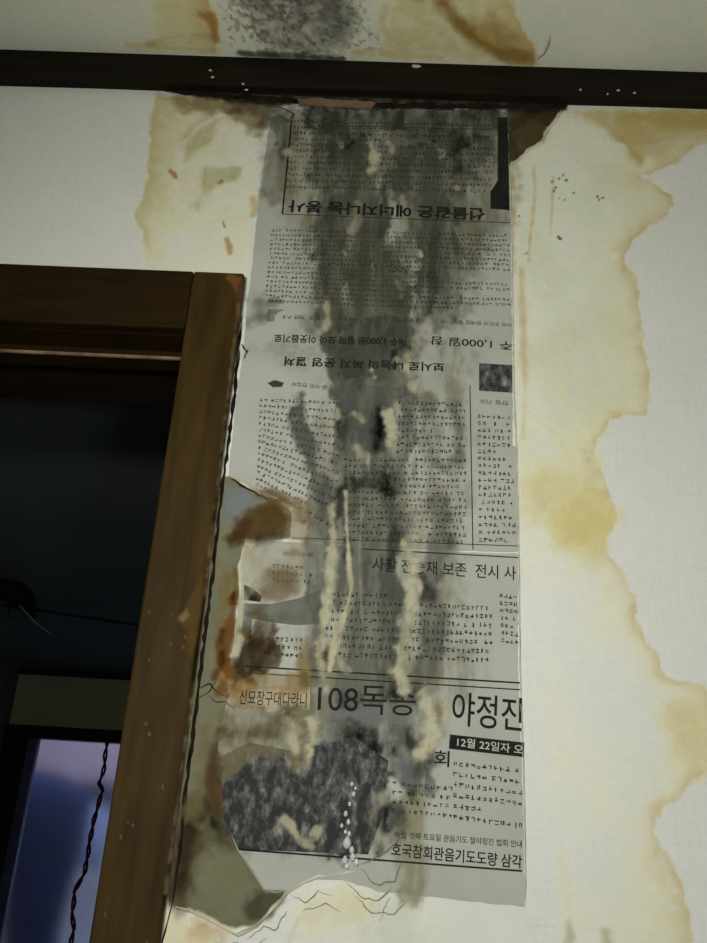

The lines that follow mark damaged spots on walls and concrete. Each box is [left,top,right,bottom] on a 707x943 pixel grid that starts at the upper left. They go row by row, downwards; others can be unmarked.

water stain [127,0,218,51]
water stain [237,0,370,61]
water stain [380,0,532,63]
corrosion [229,489,296,545]
water stain [135,95,510,902]
water stain [511,109,707,943]
corrosion [190,569,311,818]
peeling [167,476,356,937]